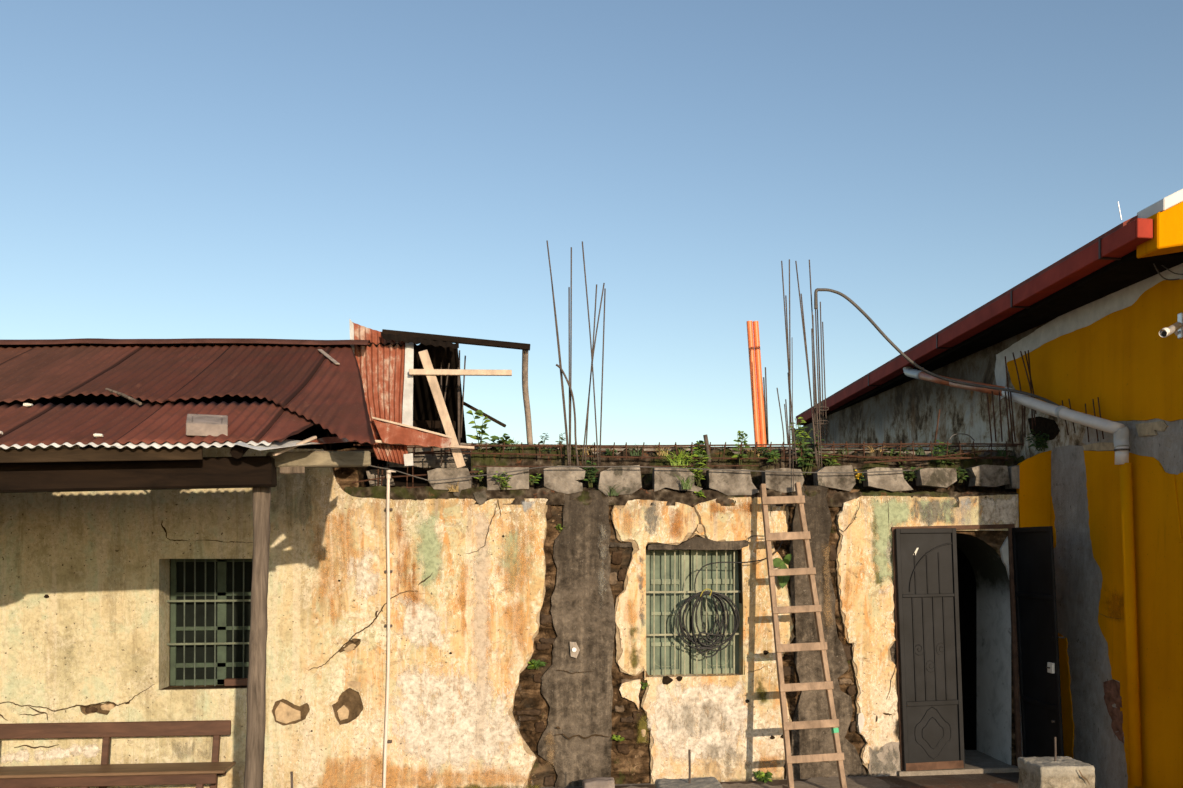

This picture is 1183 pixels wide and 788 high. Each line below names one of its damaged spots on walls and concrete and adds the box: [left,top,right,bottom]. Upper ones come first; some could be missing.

rust [349,318,459,466]
damp [322,512,379,599]
spalling [827,488,859,586]
peeling [986,263,1183,788]
crack [0,684,155,749]
spalling [272,699,310,725]
spalling [332,688,363,725]
crack [310,572,433,670]
damp [392,514,515,778]
spalling [514,505,563,788]
spalling [611,662,650,777]
spalling [835,615,901,776]